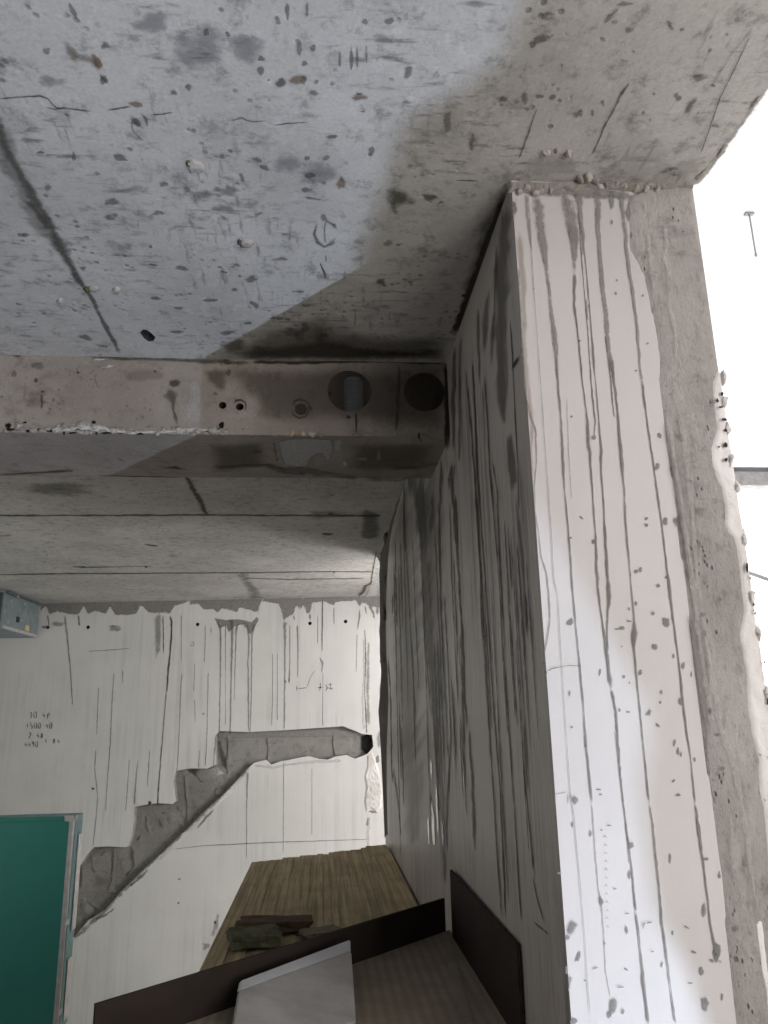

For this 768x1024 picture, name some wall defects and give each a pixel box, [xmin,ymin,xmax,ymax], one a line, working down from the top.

crack [593,84,629,153]
crack [701,39,749,152]
crack [0,124,119,351]
spalling [3,421,229,436]
spalling [74,478,404,938]
water stain [41,188,718,1023]
flaking render [711,369,768,848]